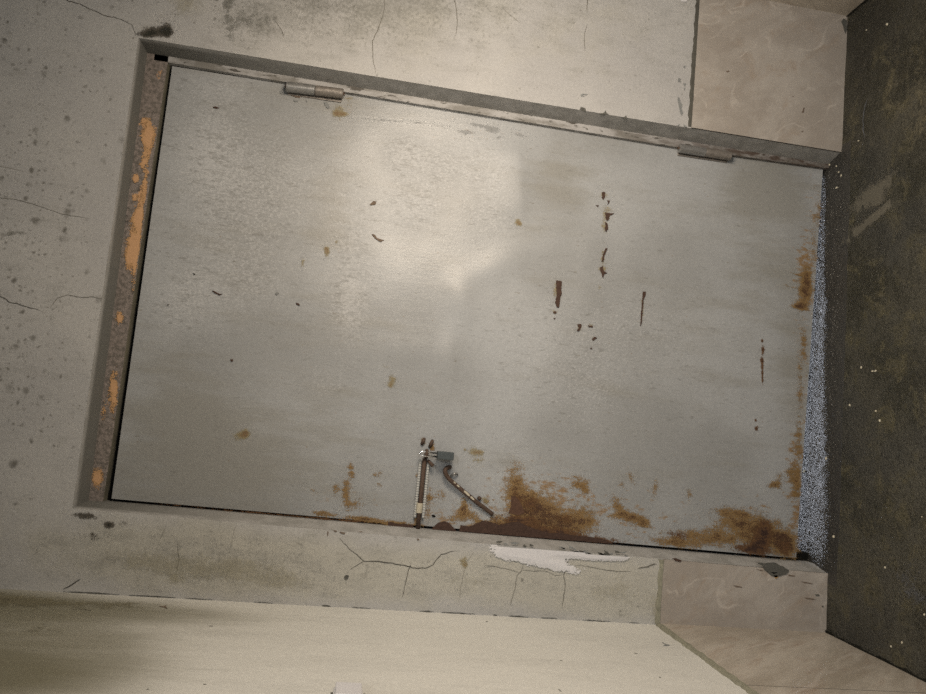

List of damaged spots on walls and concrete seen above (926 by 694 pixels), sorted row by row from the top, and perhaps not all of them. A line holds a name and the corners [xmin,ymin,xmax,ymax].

crack [67,0,136,36]
corrosion [788,203,822,311]
corrosion [767,328,808,510]
corrosion [224,460,804,561]
crack [63,579,212,600]
crack [342,541,655,619]
spalling [559,546,628,557]